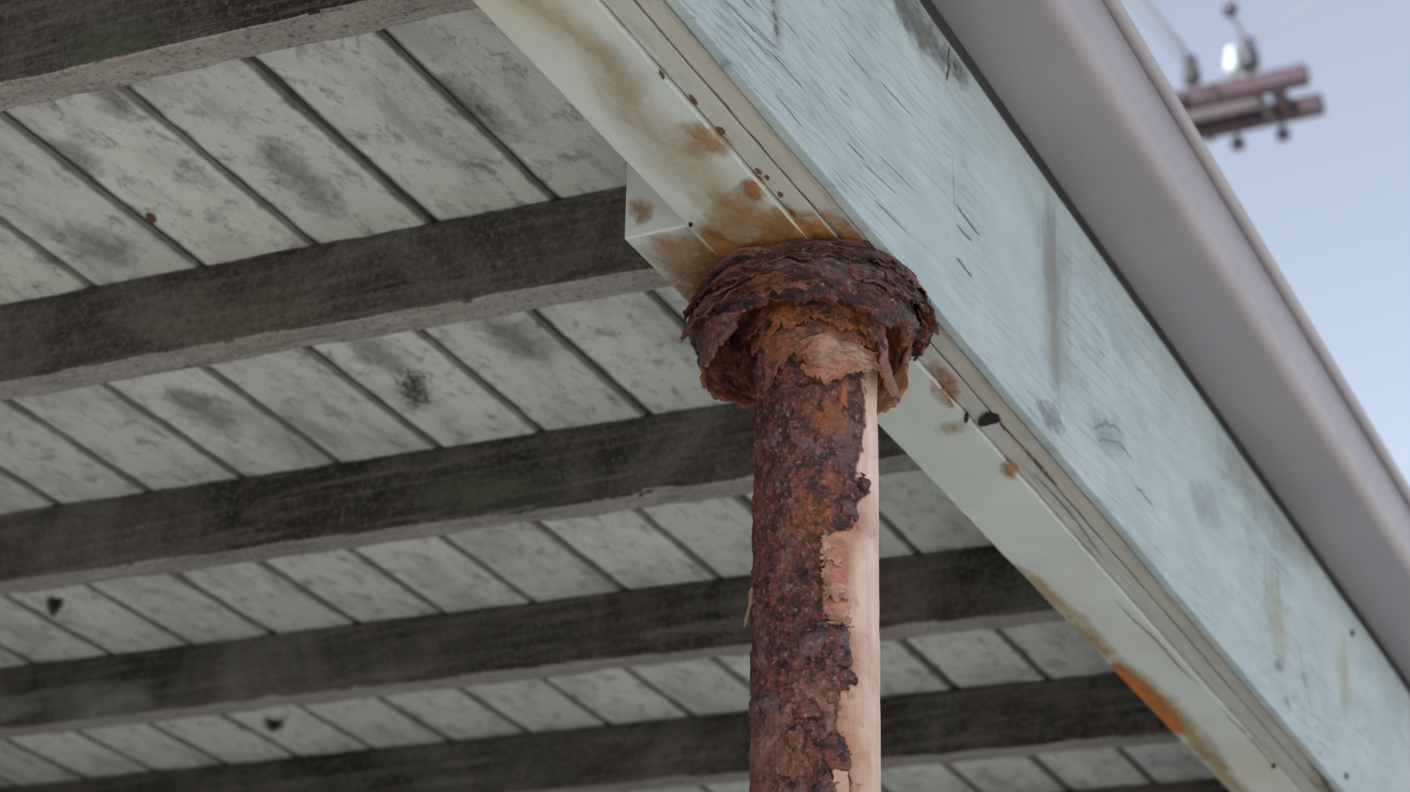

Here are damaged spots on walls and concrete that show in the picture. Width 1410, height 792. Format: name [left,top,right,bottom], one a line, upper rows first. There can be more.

corrosion [686,127,725,152]
corrosion [633,204,648,222]
corrosion [680,174,939,414]
mould [396,369,431,410]
corrosion [933,368,956,407]
corrosion [1003,459,1017,477]
crack [1093,420,1154,509]
corrosion [1030,577,1242,791]